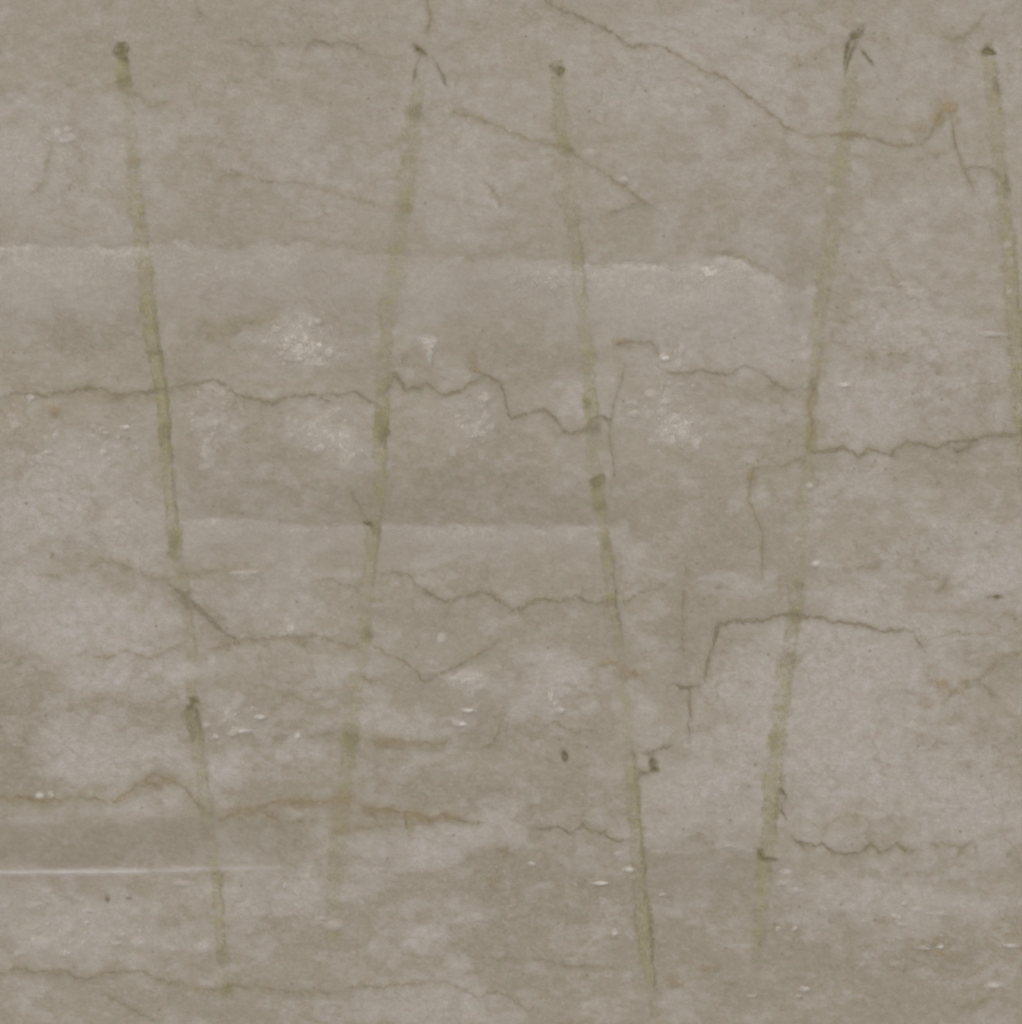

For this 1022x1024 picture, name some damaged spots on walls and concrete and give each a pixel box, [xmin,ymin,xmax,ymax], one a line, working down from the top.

leakage [0,243,300,292]
leakage [491,239,789,319]
crack [355,373,607,436]
crack [808,390,1022,456]
crack [161,578,255,646]
crack [676,614,920,715]